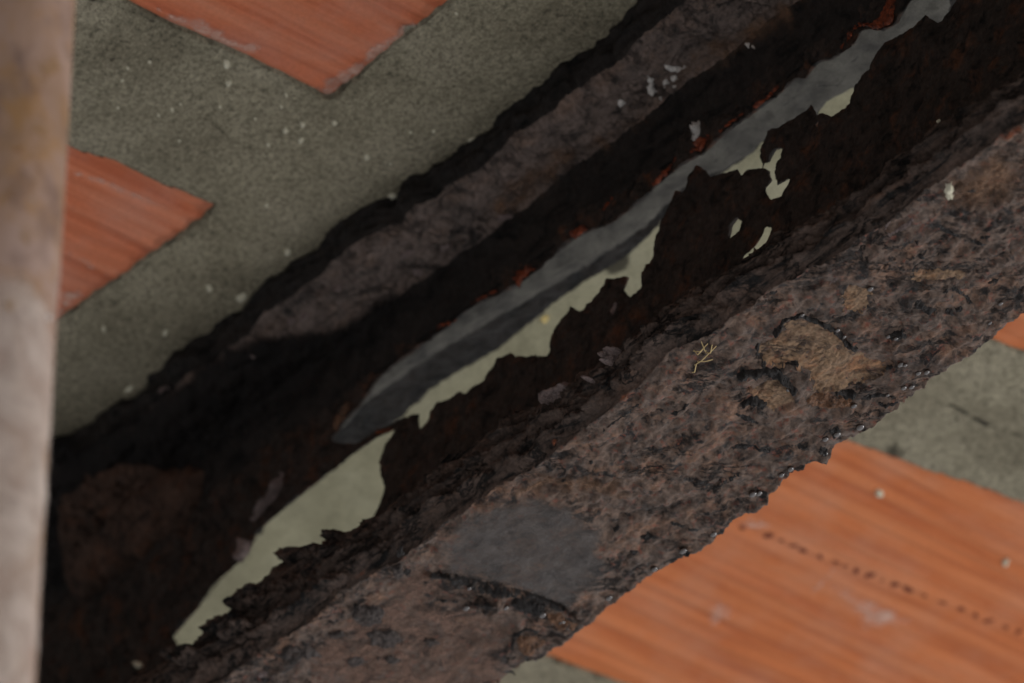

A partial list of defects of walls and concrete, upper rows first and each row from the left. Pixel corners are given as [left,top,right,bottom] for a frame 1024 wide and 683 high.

rust [689,86,779,154]
rust [840,285,873,314]
rust [597,346,622,366]
rust [736,314,887,411]
rust [40,297,401,593]
spalling [818,426,842,457]
spalling [630,532,654,556]